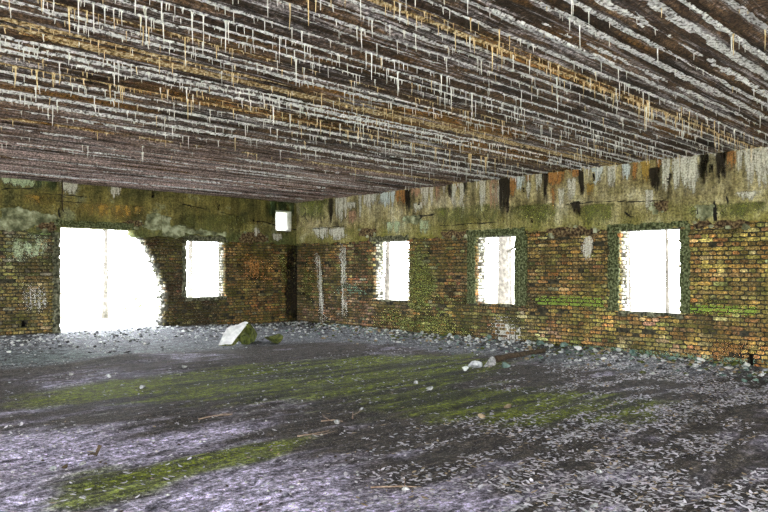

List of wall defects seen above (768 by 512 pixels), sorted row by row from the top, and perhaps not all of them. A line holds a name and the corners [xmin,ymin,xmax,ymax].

water stain [0,0,768,323]
corrosion [464,36,653,107]